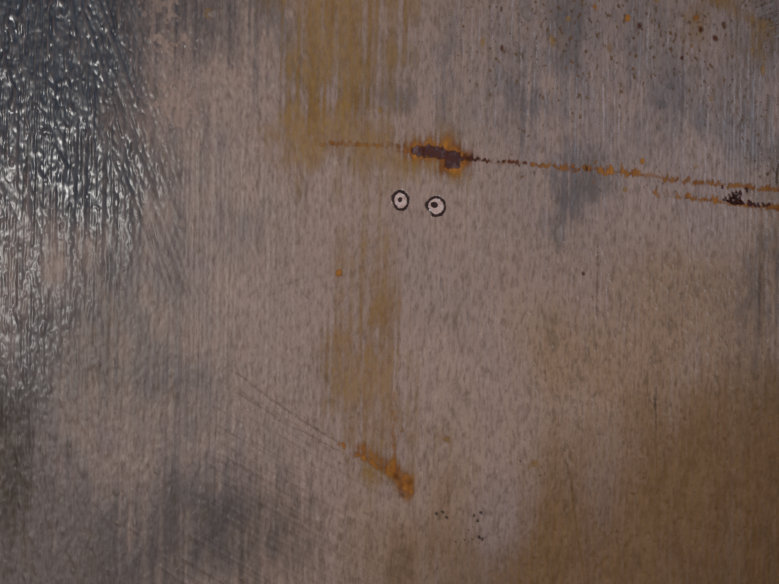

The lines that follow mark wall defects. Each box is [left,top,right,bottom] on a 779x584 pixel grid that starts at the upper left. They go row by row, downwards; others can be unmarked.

rust [397,136,644,177]
rust [653,178,779,211]
rust [355,444,414,499]